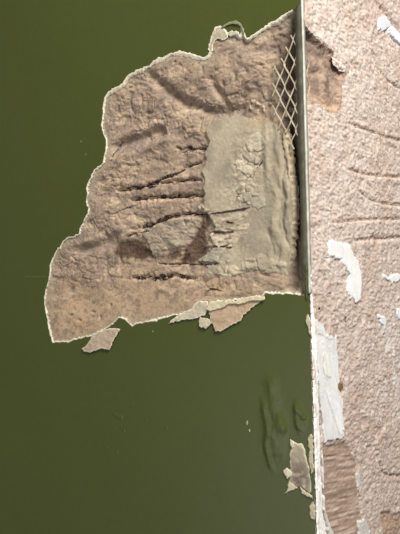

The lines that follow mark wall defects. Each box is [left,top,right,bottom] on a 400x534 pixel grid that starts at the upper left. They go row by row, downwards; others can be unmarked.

flaking render [305,24,356,115]
flaking render [44,9,306,353]
crack [117,145,249,237]
crack [135,262,220,281]
crack [206,231,234,247]
peeling [283,439,312,498]